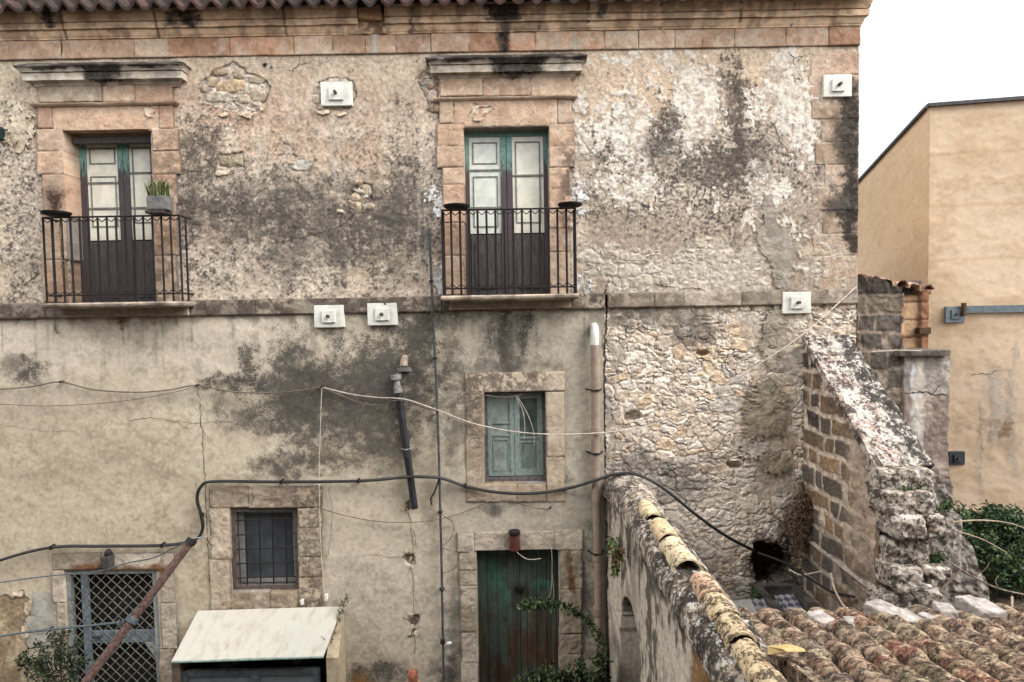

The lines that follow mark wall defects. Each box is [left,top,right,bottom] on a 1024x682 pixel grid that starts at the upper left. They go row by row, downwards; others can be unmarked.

flaking render [216,151,246,176]
flaking render [198,61,272,119]
damp [177,121,438,290]
flaking render [336,181,374,214]
damp [489,21,549,80]
damp [644,59,773,191]
damp [821,77,859,255]
damp [196,311,560,485]
crack [906,384,946,396]
crack [129,389,240,581]
flaking render [0,590,52,682]
crack [358,511,418,653]